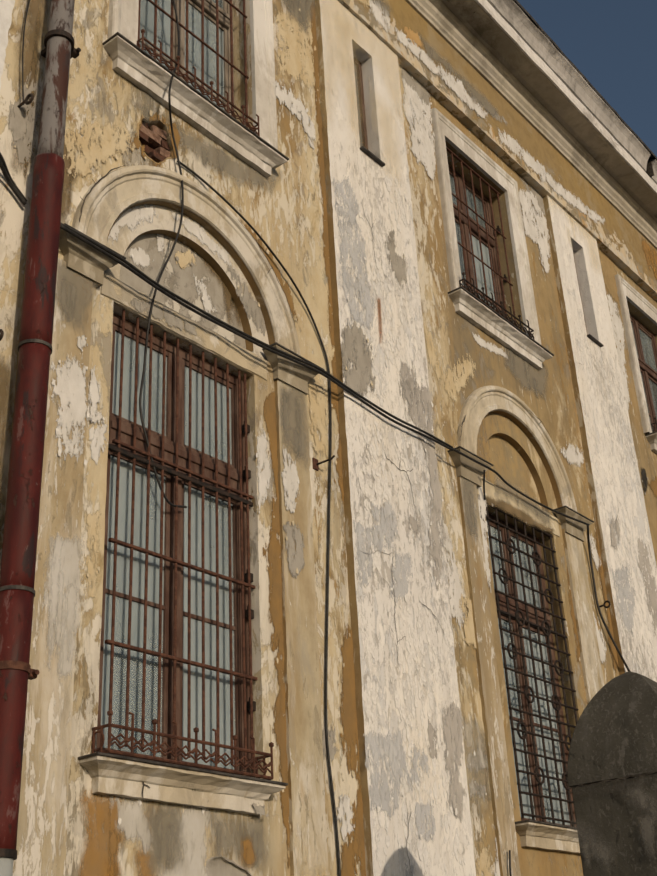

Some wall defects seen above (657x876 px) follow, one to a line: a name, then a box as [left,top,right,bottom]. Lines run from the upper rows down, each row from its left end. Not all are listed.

peeling [63,110,181,178]
peeling [359,0,605,225]
peeling [49,335,109,465]
peeling [130,234,165,268]
peeling [171,212,266,336]
peeling [275,3,500,876]
peeling [519,178,551,273]
peeling [574,248,632,423]
peeling [561,443,657,676]
peeling [253,389,305,868]
peeling [112,796,153,854]
peeling [159,806,252,876]